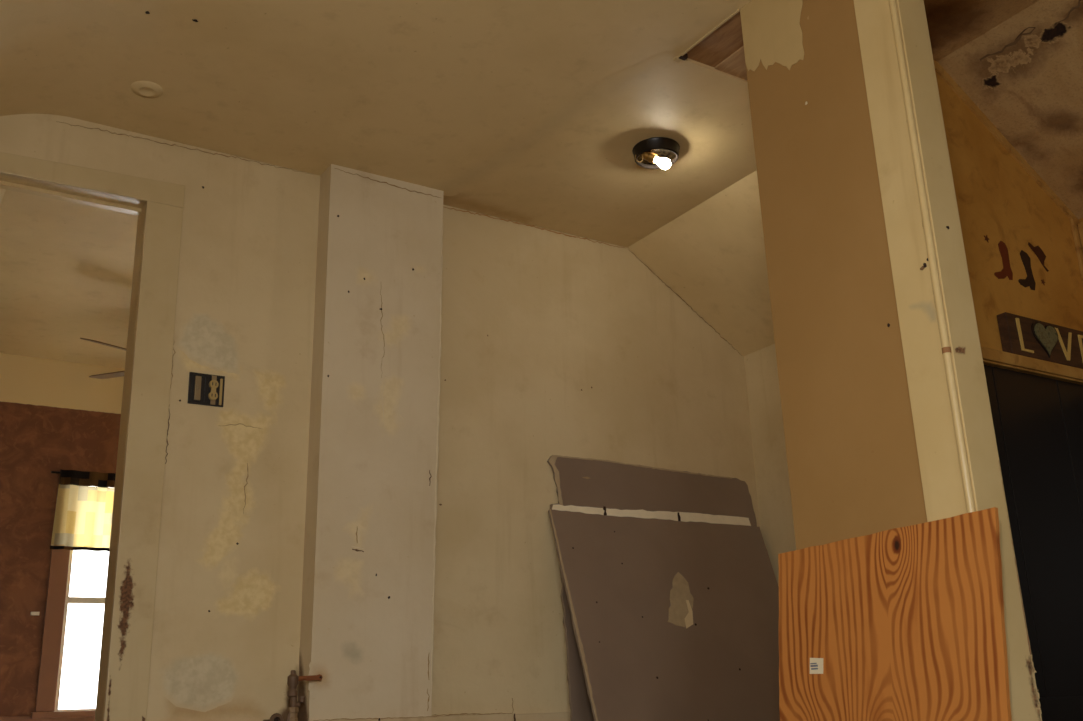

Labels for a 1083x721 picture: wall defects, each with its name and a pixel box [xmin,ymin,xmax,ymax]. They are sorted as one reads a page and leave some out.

peeling [740,0,809,71]
damp [924,0,1083,107]
peeling [980,0,1081,91]
damp [998,102,1083,203]
peeling [998,460,1042,721]